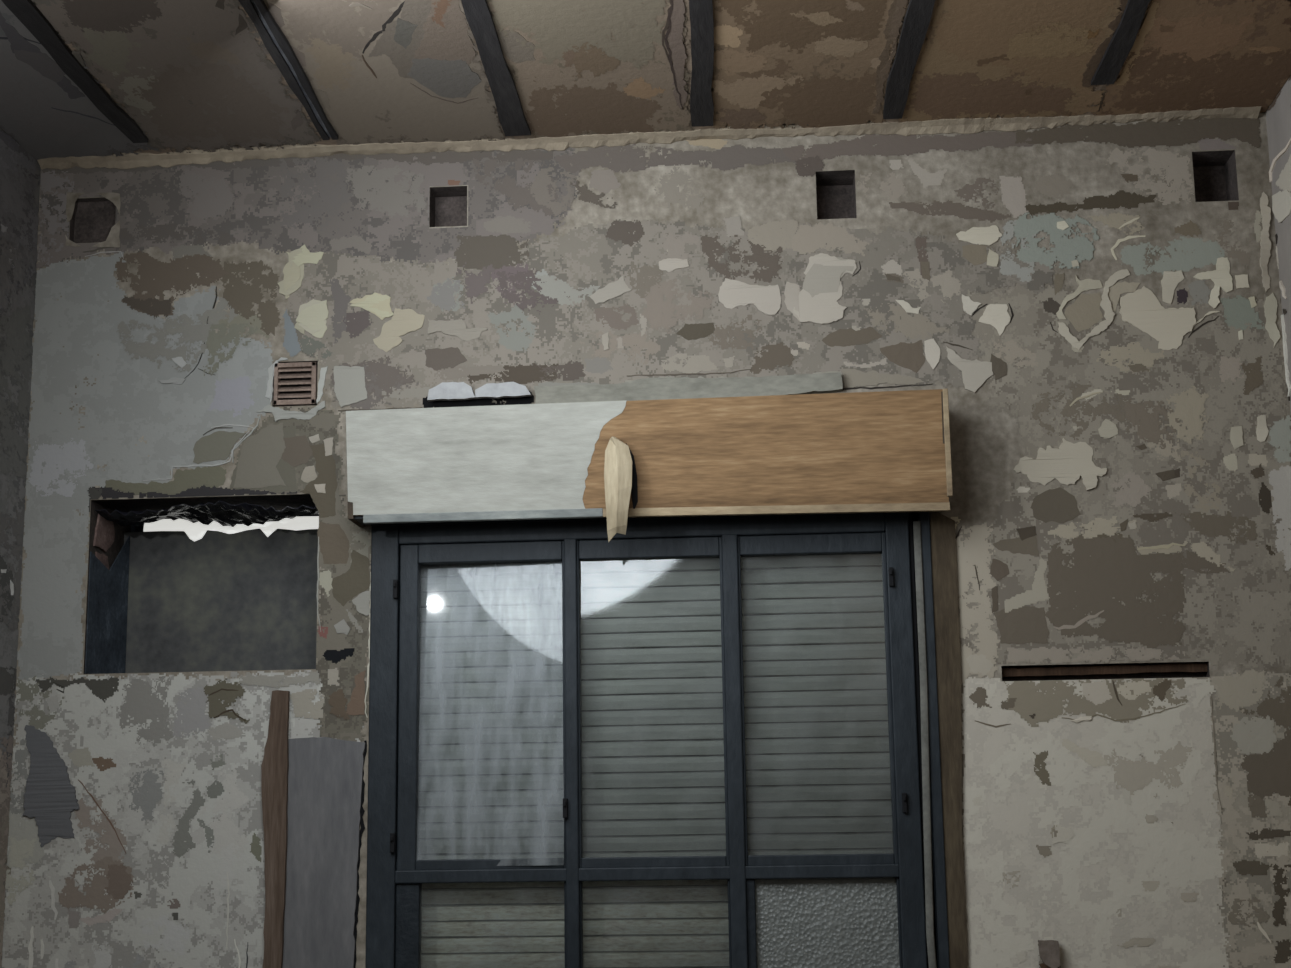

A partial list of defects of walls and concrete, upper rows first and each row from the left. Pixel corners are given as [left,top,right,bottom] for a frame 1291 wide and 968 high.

crack [362,1,405,78]
peeling [999,176,1028,218]
peeling [278,234,372,338]
peeling [350,292,507,380]
peeling [589,276,631,304]
peeling [661,323,735,373]
peeling [718,253,1010,393]
peeling [956,225,1002,267]
peeling [1056,154,1291,352]
peeling [1223,415,1269,471]
spalling [105,357,371,635]
peeling [990,419,1118,644]